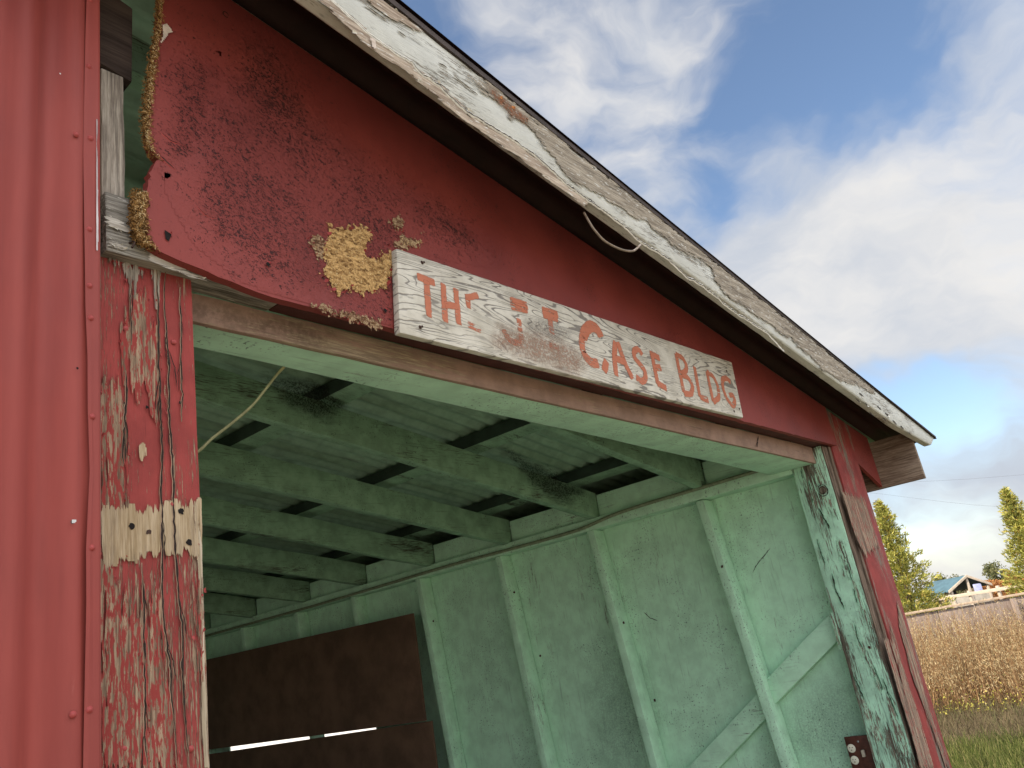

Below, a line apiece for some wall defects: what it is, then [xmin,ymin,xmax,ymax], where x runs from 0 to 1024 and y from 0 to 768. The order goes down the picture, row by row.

crack [121,370,129,467]
peeling [96,119,207,768]
crack [129,270,190,768]
peeling [308,0,910,434]
peeling [841,490,879,558]
peeling [836,536,934,768]